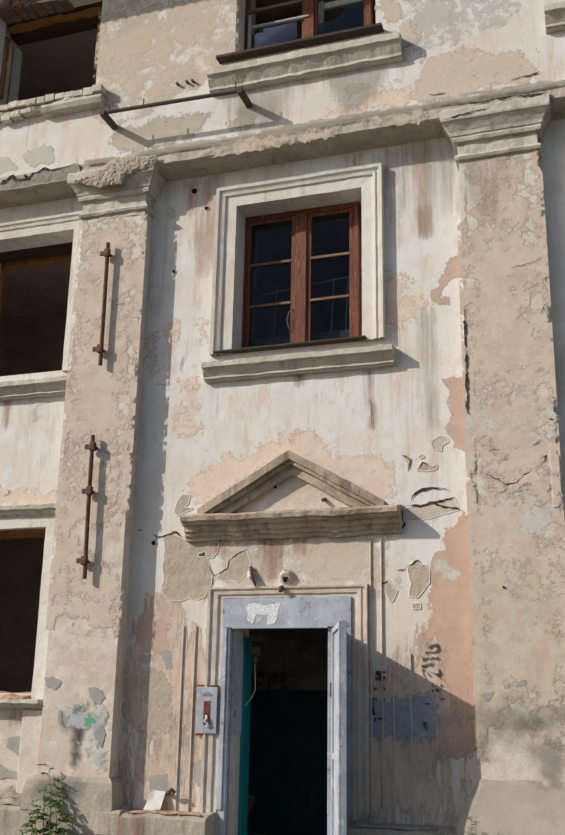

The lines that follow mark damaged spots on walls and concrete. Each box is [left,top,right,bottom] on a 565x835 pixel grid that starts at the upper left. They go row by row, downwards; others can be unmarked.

peeling [374,0,422,50]
peeling [0,0,247,192]
peeling [195,44,541,158]
crack [430,71,548,119]
crack [0,164,73,185]
crack [462,310,470,413]
peeling [0,214,181,638]
crack [485,439,547,485]
peeling [118,150,565,827]
crack [402,487,460,529]
peeling [45,677,61,690]
water stain [71,727,83,764]